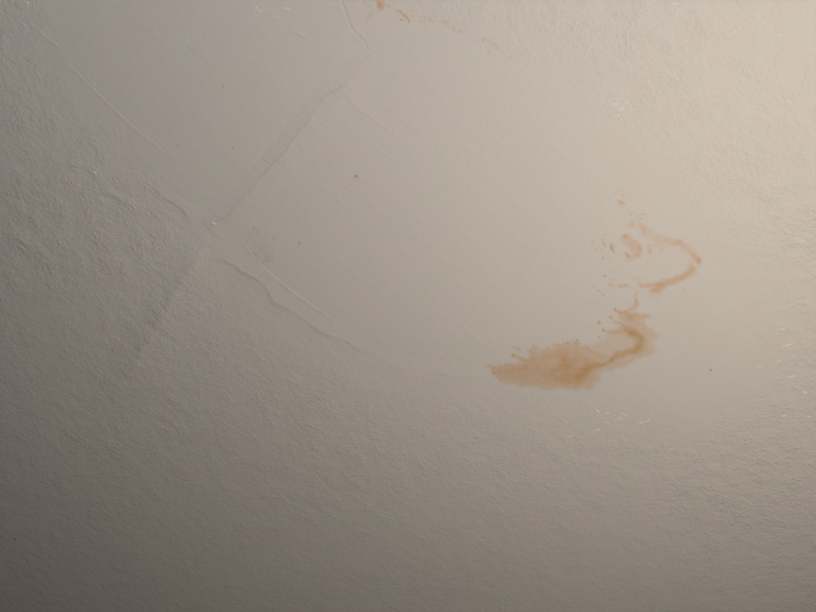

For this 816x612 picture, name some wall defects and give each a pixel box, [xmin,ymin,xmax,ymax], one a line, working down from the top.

leakage [485,187,704,393]